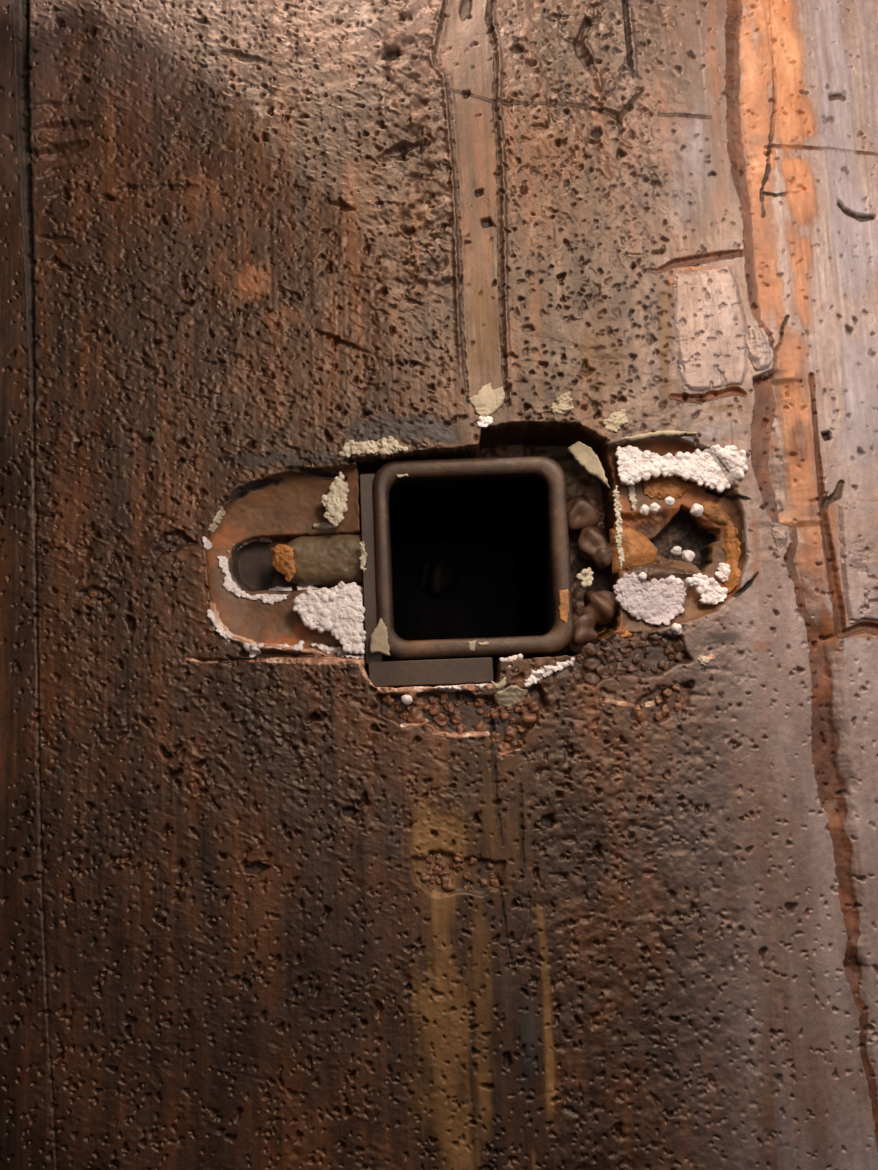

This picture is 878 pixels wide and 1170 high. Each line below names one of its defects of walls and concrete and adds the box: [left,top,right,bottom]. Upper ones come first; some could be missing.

rust [762,0,839,572]
peeling [621,430,697,441]
peeling [567,441,610,489]
rust [643,476,694,500]
crack [428,0,878,1152]
rust [626,563,697,580]
rust [690,500,742,594]
damp [209,601,334,656]
peeling [370,618,390,656]
spalling [570,630,694,724]